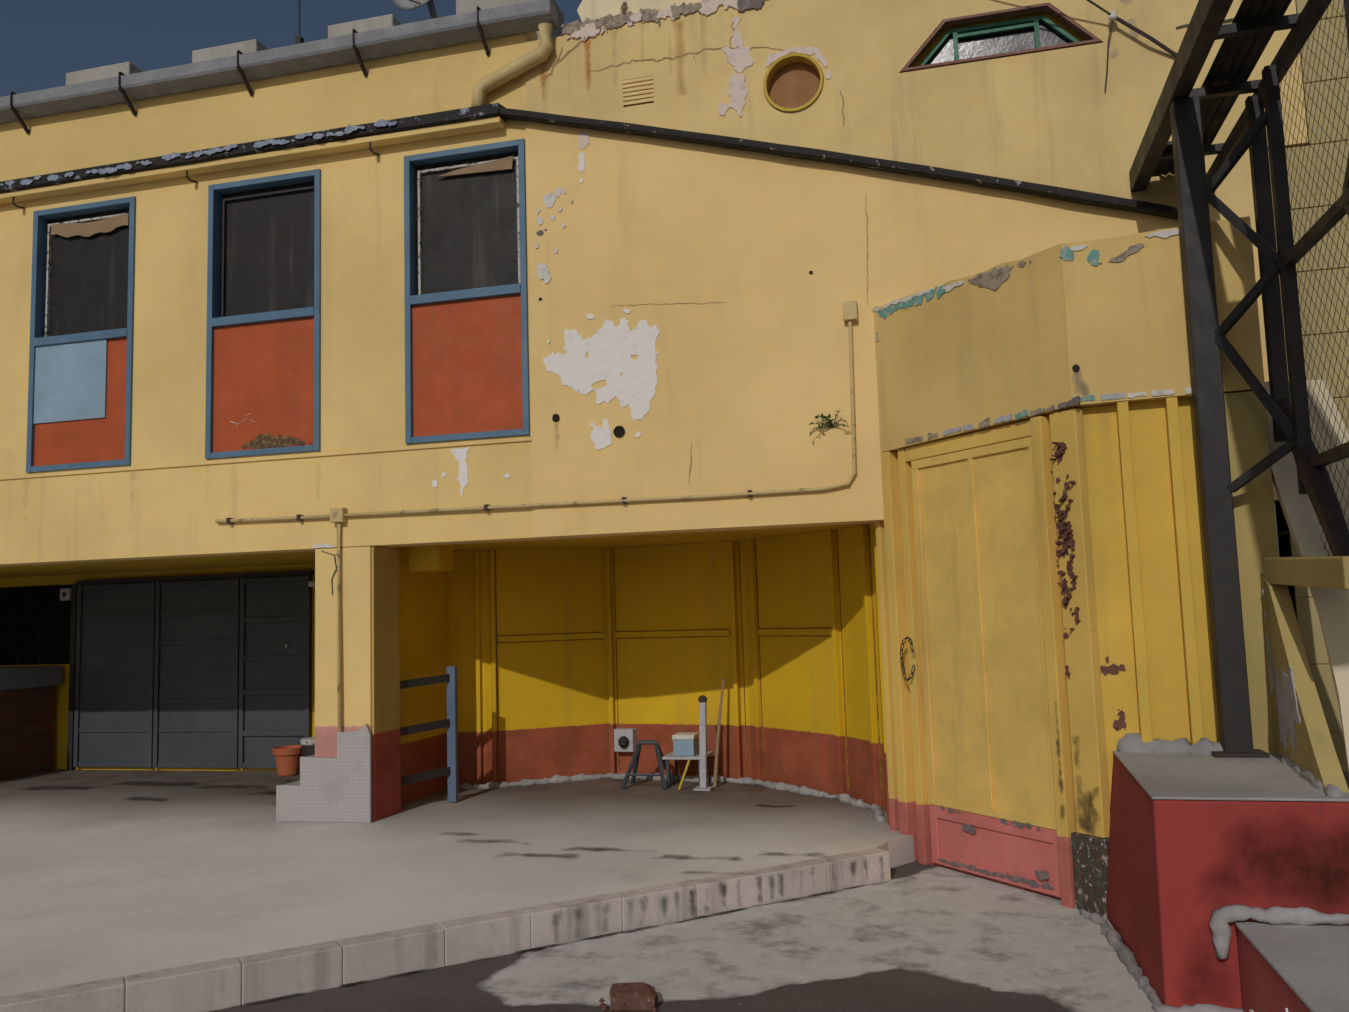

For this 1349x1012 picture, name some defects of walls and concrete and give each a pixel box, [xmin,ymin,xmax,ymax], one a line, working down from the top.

spalling [561,0,831,118]
peeling [253,119,396,148]
peeling [0,144,237,186]
peeling [535,187,573,301]
peeling [1059,228,1180,266]
peeling [872,260,1032,319]
peeling [543,309,660,450]
peeling [431,447,470,496]
peeling [1050,442,1081,638]
peeling [1100,656,1126,676]
peeling [1113,709,1127,730]
peeling [1266,635,1301,755]